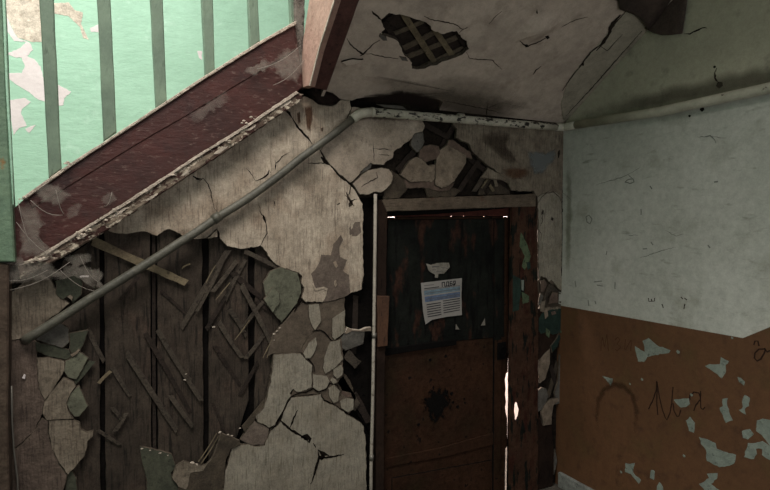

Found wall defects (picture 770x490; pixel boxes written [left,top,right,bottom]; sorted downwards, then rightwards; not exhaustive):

peeling [6,0,45,134]
peeling [58,85,71,106]
peeling [54,2,98,40]
crack [286,111,364,207]
crack [347,39,398,59]
flaking render [379,13,467,66]
flaking render [350,91,514,199]
crack [562,11,642,116]
flaking render [11,222,373,490]
flaking render [513,233,561,490]
crack [271,358,344,483]
peeling [686,417,770,490]